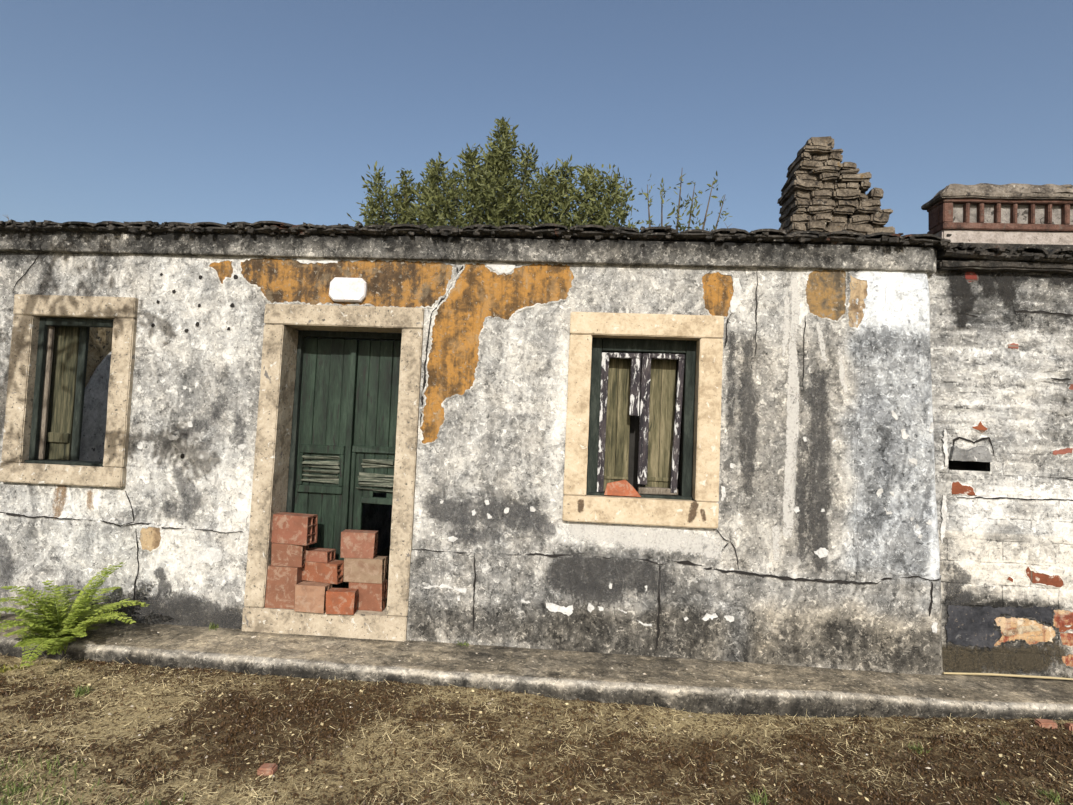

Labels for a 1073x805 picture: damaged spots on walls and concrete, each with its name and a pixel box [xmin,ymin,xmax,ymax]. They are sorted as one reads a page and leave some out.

flaking render [699,270,742,319]
flaking render [803,269,870,330]
flaking render [198,257,576,446]
crack [412,265,942,651]
water stain [772,277,848,573]
peeling [929,422,949,466]
flaking render [1051,446,1073,456]
crack [0,490,244,621]
water stain [424,496,555,544]
water stain [546,522,724,604]
flaking render [1005,565,1066,588]
peeling [931,589,1073,668]